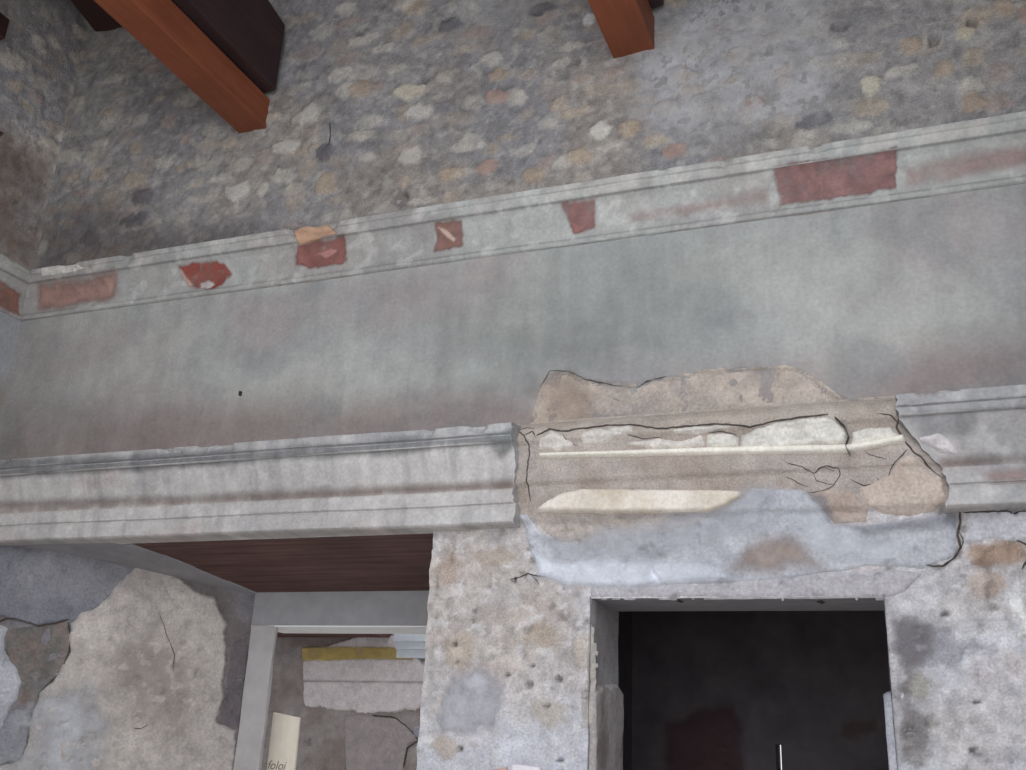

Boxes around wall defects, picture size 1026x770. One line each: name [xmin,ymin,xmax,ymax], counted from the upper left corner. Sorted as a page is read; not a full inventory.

flaking render [532,365,898,452]
crack [518,370,943,501]
flaking render [919,433,960,457]
flaking render [812,455,945,524]
crack [927,510,1026,567]
flaking render [0,568,248,770]